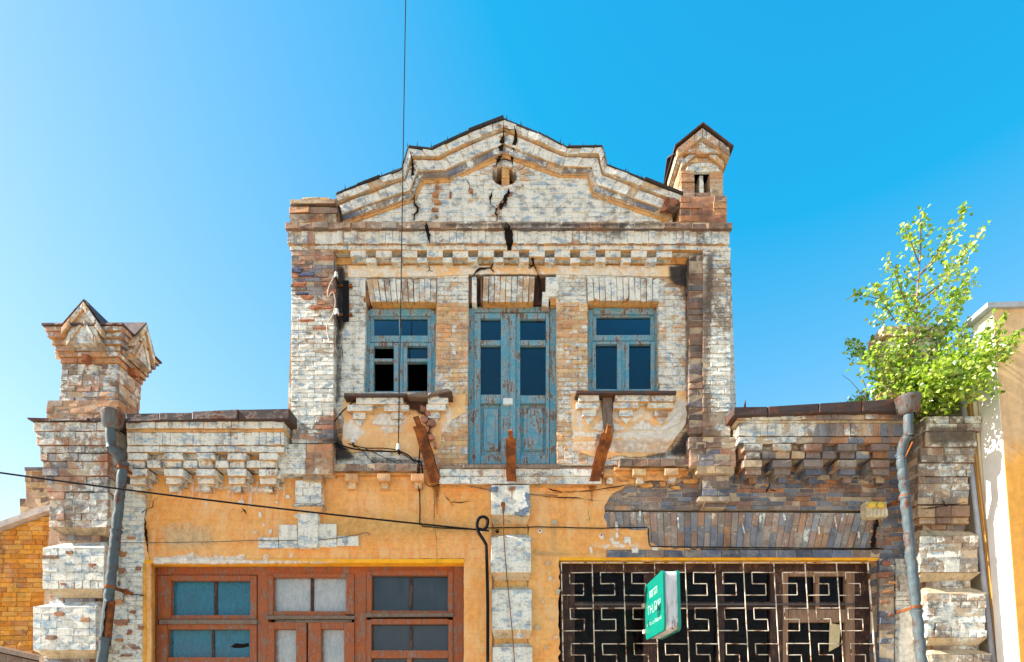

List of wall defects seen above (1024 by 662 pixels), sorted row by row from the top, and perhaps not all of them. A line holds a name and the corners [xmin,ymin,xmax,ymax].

crack [410,151,434,272]
crack [467,123,542,300]
spalling [420,405,437,449]
peeling [571,432,672,453]
peeling [607,471,699,491]
crack [142,498,157,559]
peeling [589,521,639,554]
crack [867,520,882,548]